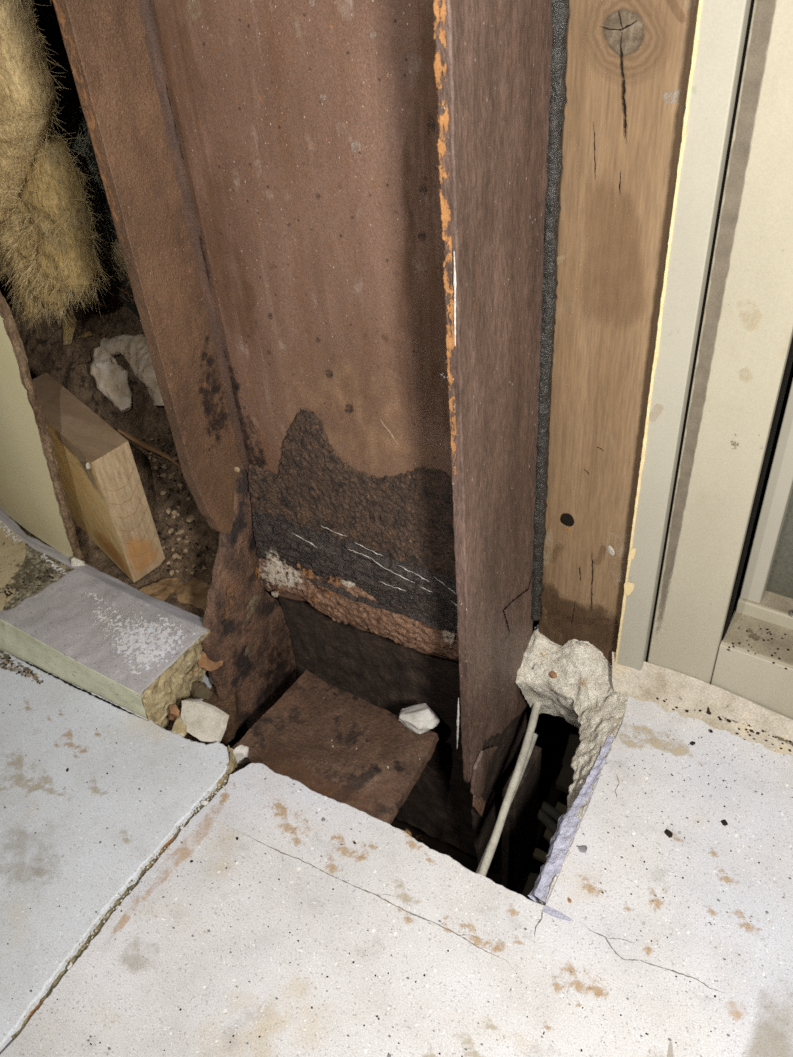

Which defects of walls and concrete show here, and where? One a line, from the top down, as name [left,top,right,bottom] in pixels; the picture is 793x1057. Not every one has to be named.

crack [603,13,638,142]
damp [539,587,619,665]
spalling [516,628,628,908]
crack [236,830,514,970]
crack [580,922,724,993]